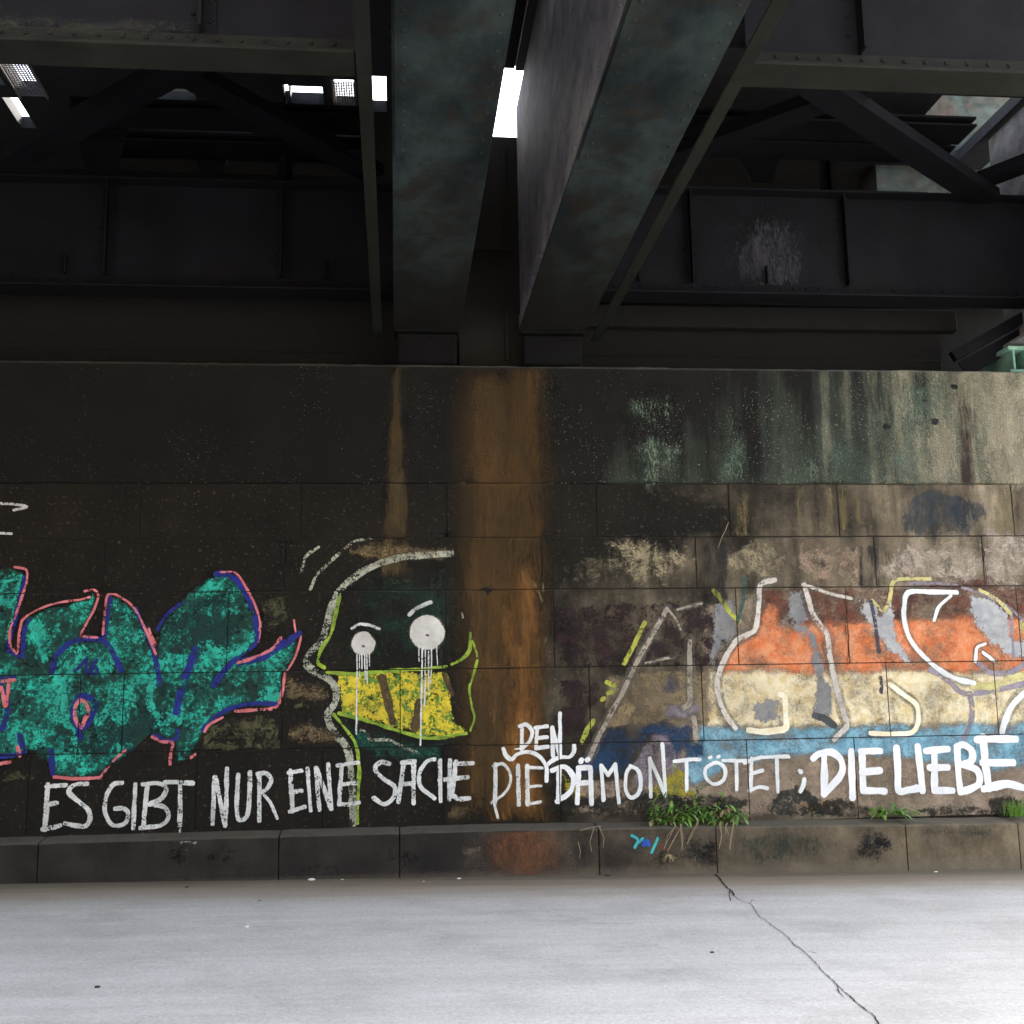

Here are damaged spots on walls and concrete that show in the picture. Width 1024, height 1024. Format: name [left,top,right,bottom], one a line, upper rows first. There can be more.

rust [380,377,409,576]
damp [630,396,680,488]
damp [880,380,1024,540]
rust [461,371,545,817]
crack [715,874,879,1024]